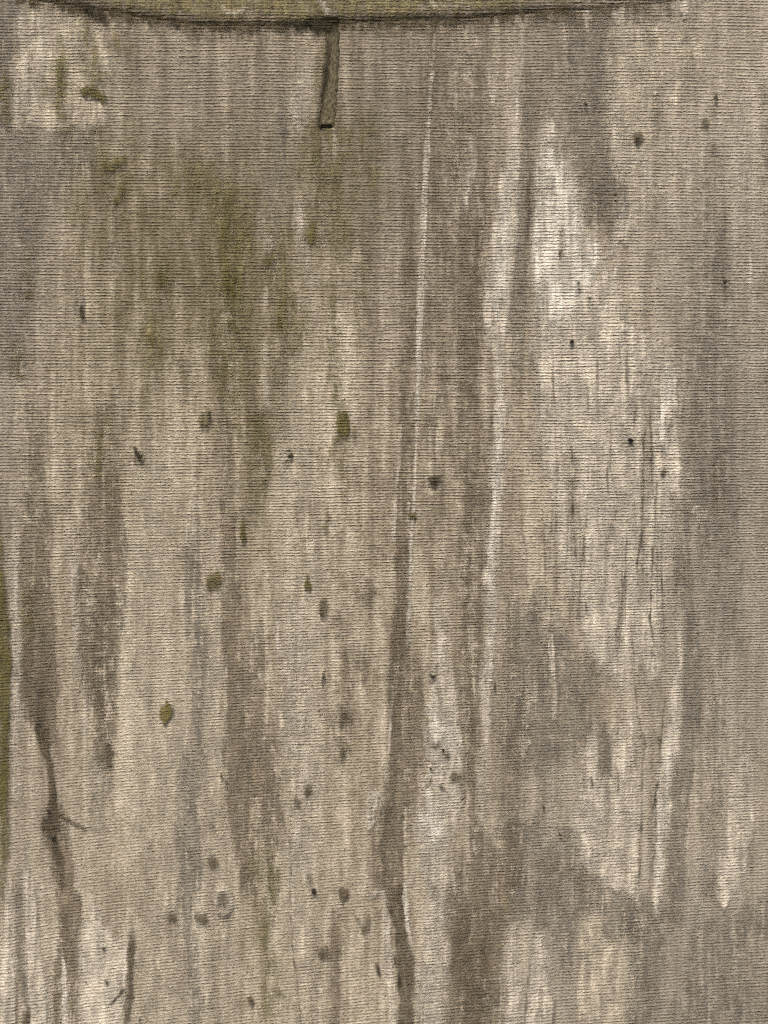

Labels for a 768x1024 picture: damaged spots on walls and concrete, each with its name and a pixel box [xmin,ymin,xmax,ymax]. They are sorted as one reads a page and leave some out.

leakage [0,367,377,1024]
leakage [367,0,736,1024]
leakage [680,756,768,1024]